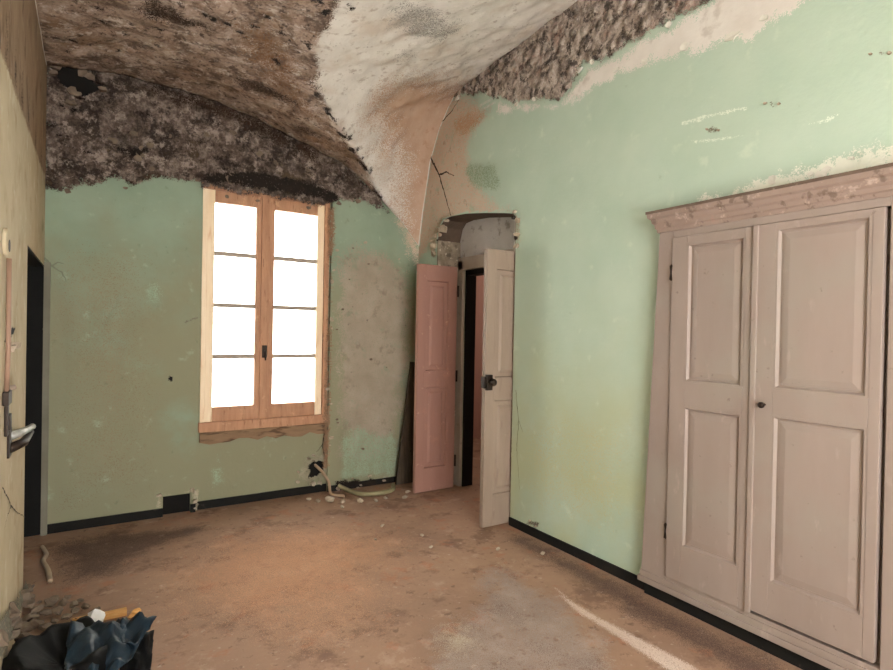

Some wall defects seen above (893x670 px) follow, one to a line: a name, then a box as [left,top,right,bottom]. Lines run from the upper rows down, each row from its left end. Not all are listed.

damp [386,2,465,63]
spalling [418,0,811,263]
crack [431,158,454,215]
peeling [732,138,893,195]
spalling [45,65,389,486]
spalling [335,477,395,491]